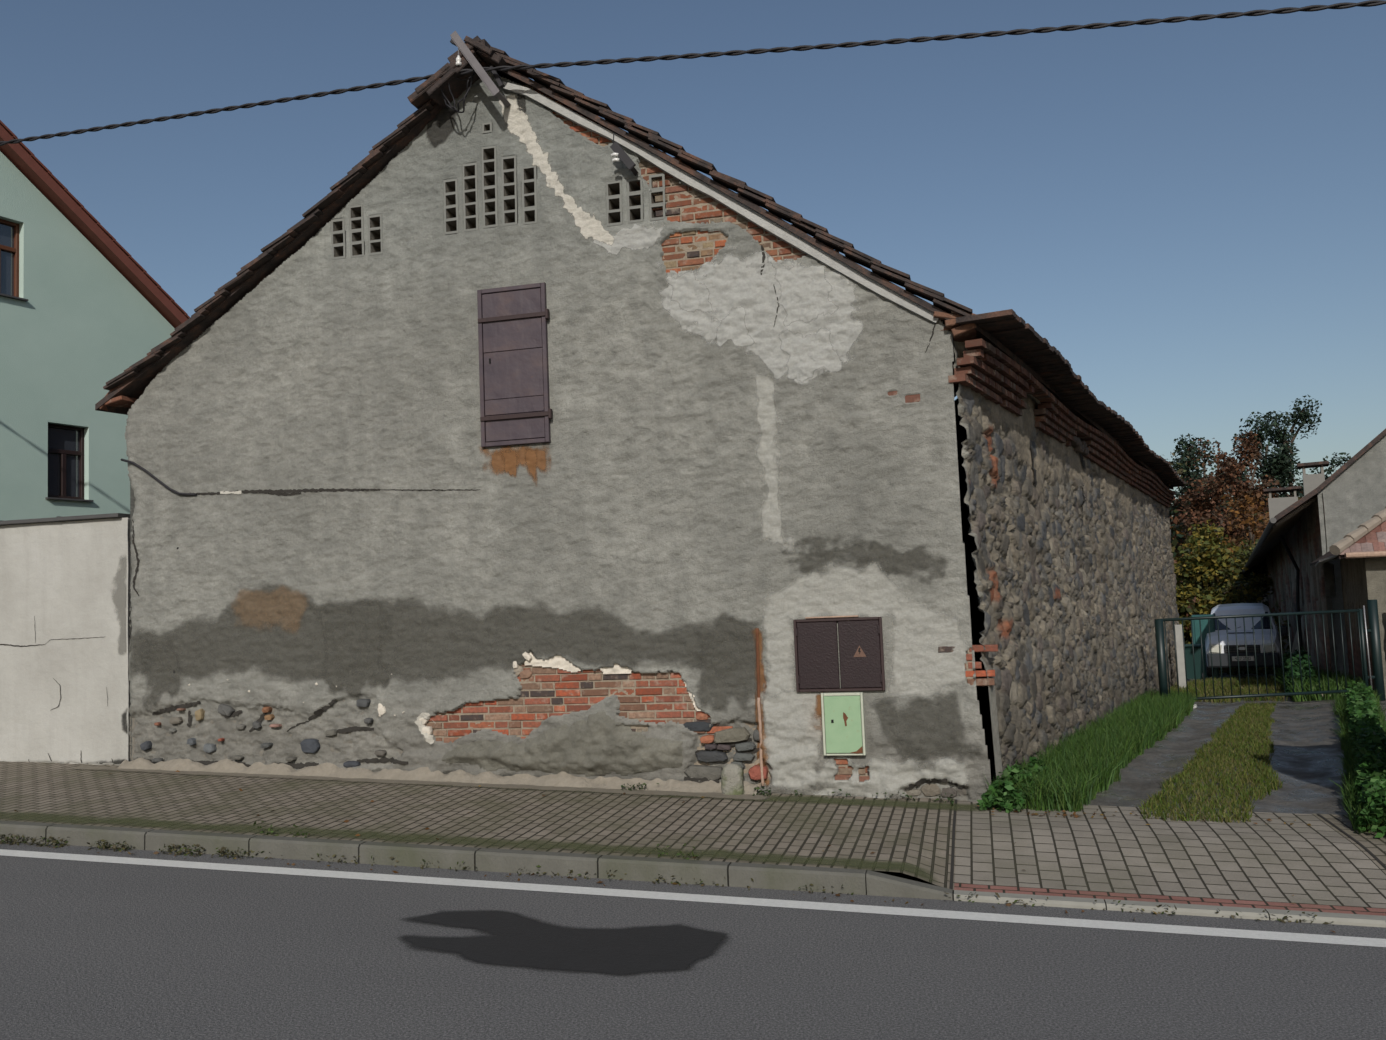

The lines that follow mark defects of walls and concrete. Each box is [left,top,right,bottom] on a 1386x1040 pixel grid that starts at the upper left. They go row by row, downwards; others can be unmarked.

peeling [635,151,863,384]
crack [0,519,140,650]
damp [113,558,757,710]
spalling [97,652,771,787]